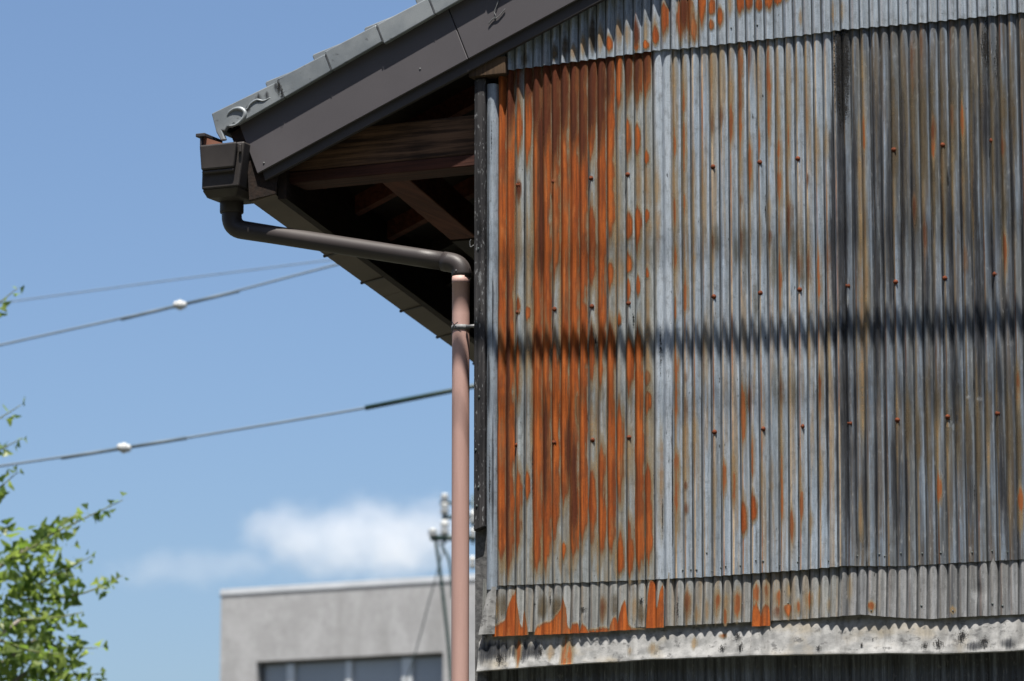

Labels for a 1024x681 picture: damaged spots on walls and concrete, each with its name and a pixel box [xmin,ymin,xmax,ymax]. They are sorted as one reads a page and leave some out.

rust [492,0,787,668]
rust [684,581,830,638]